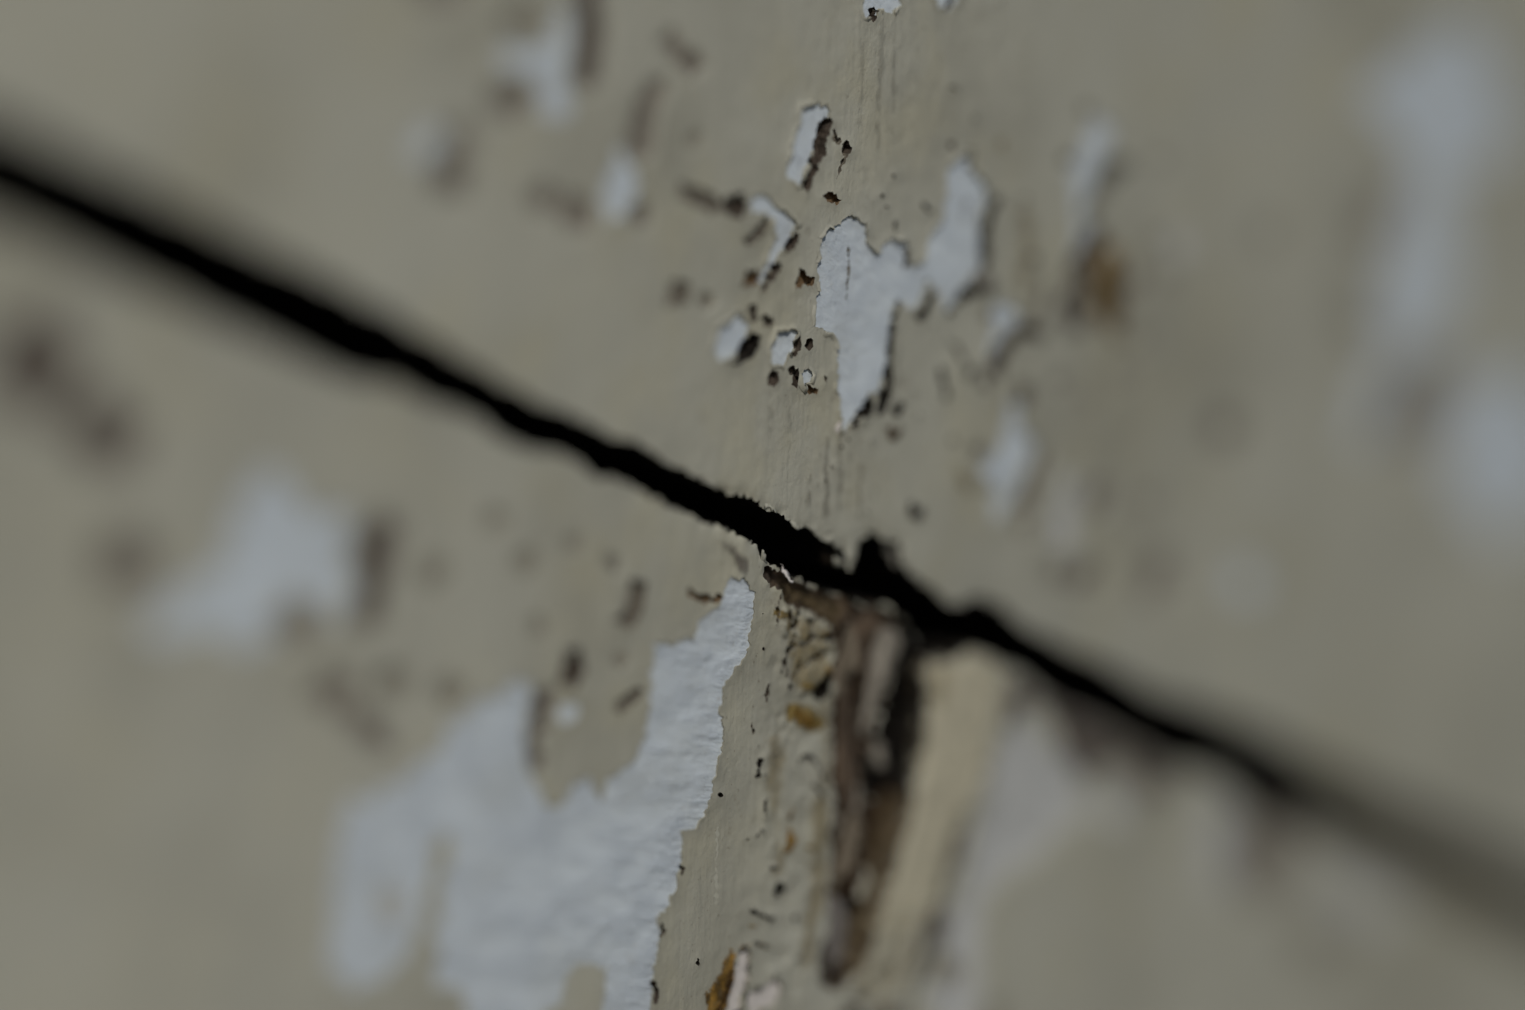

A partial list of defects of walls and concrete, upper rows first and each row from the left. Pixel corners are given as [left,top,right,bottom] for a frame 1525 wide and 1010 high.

peeling [859,0,903,22]
peeling [709,99,1003,449]
crack [0,121,1408,856]
peeling [979,381,1052,540]
hole [812,673,832,701]
peeling [326,576,765,1010]
crack [713,824,777,951]
peeling [769,866,786,898]
crack [1320,780,1525,938]
peeling [726,947,782,1010]